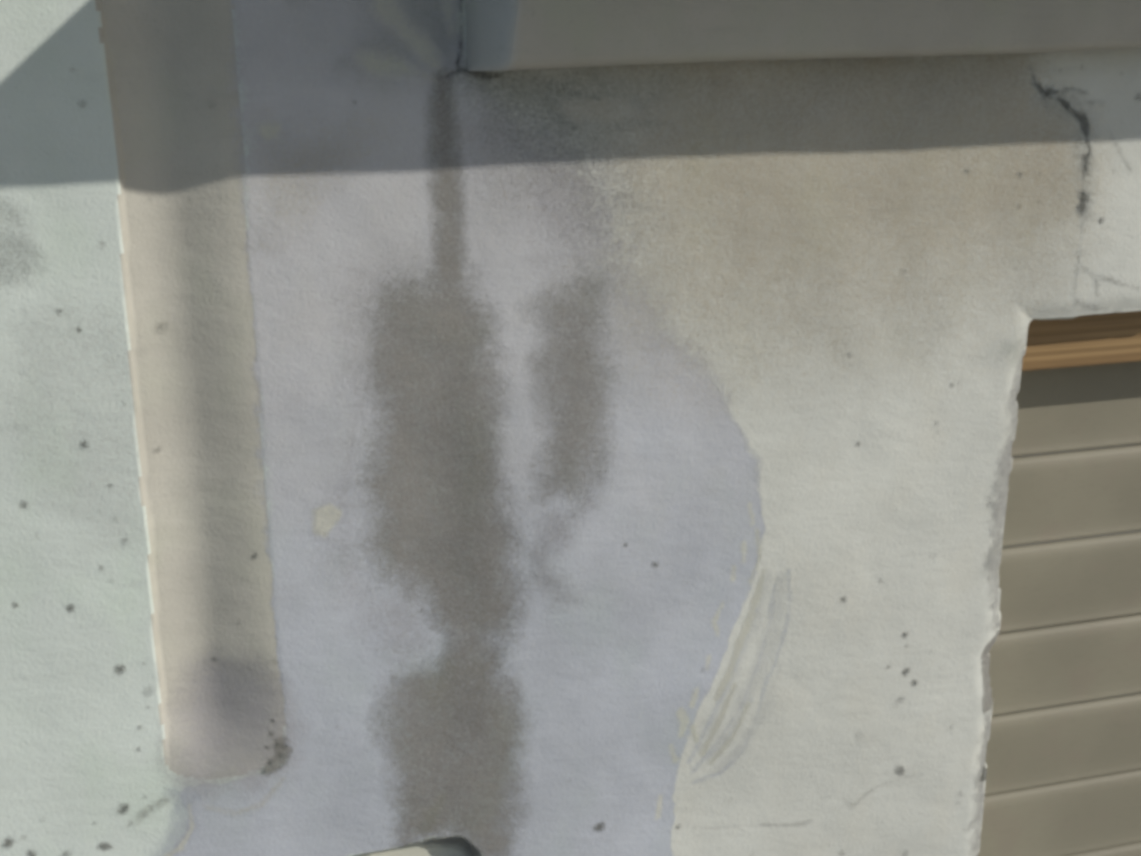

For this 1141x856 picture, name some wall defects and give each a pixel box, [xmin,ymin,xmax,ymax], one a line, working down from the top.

crack [1028,64,1140,311]
spalling [261,720,294,775]